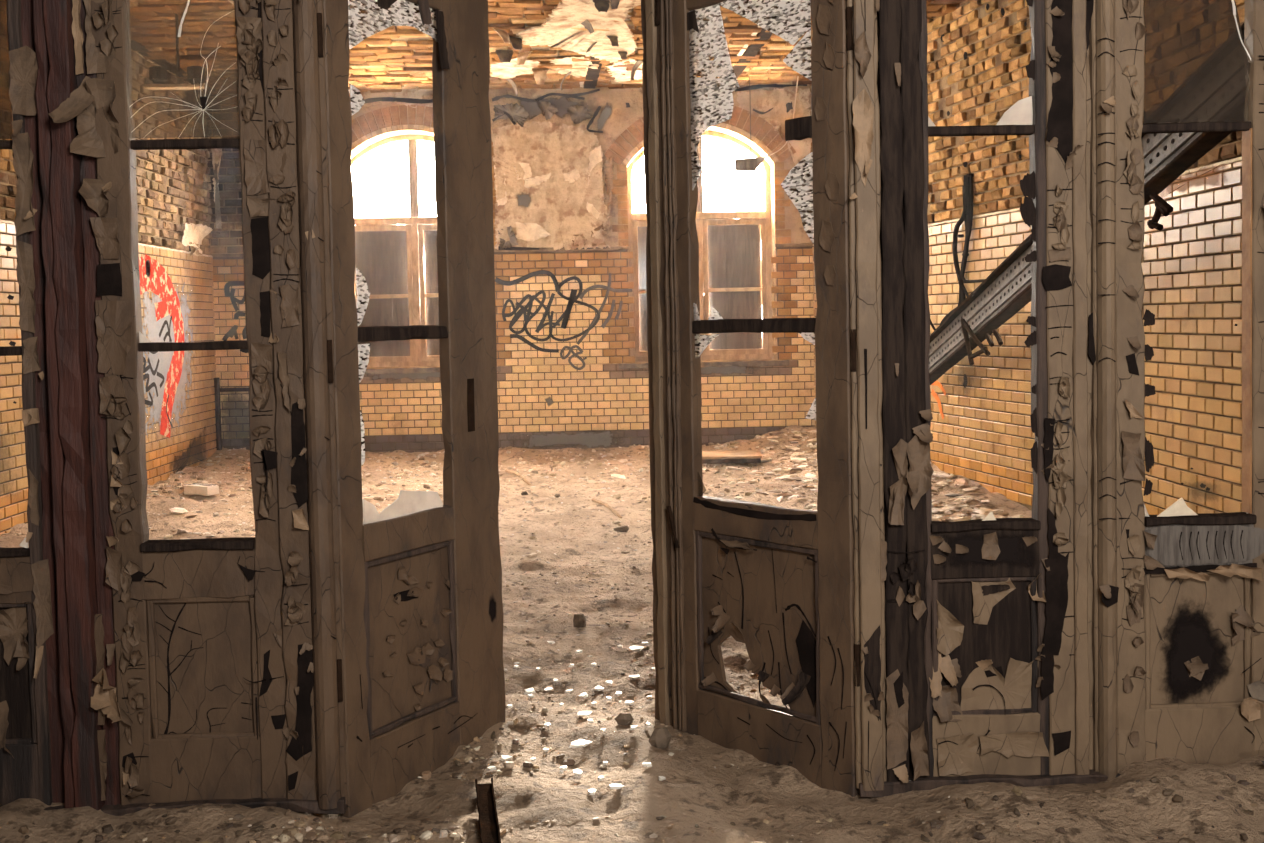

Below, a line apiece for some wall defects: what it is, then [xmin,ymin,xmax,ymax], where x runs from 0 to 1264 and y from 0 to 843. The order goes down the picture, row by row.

peeling [5,0,121,380]
peeling [490,0,643,250]
peeling [1026,0,1094,169]
peeling [1101,0,1147,250]
peeling [888,409,934,525]
peeling [1030,384,1055,482]
peeling [1123,285,1156,397]
peeling [0,558,54,679]
crack [156,603,253,734]
peeling [244,551,314,791]
crack [704,551,847,771]
peeling [862,508,1071,783]